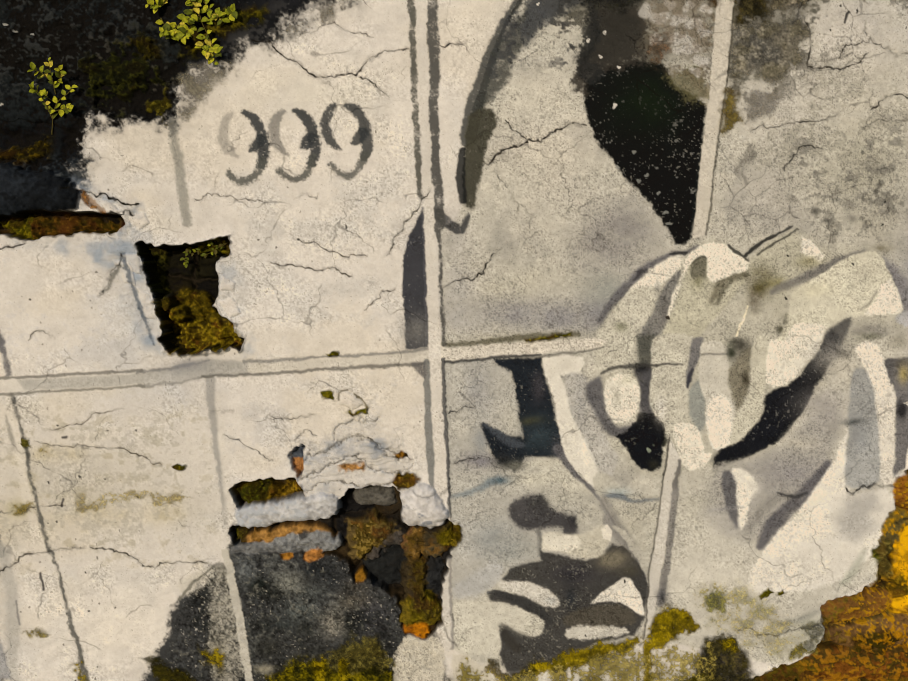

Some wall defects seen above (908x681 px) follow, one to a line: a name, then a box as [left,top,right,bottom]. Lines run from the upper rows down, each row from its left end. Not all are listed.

crack [252,40,380,87]
crack [807,43,878,70]
crack [489,120,587,178]
flaking render [0,0,268,358]
flaking render [228,390,464,641]
crack [91,547,172,567]
flaking render [753,469,908,681]